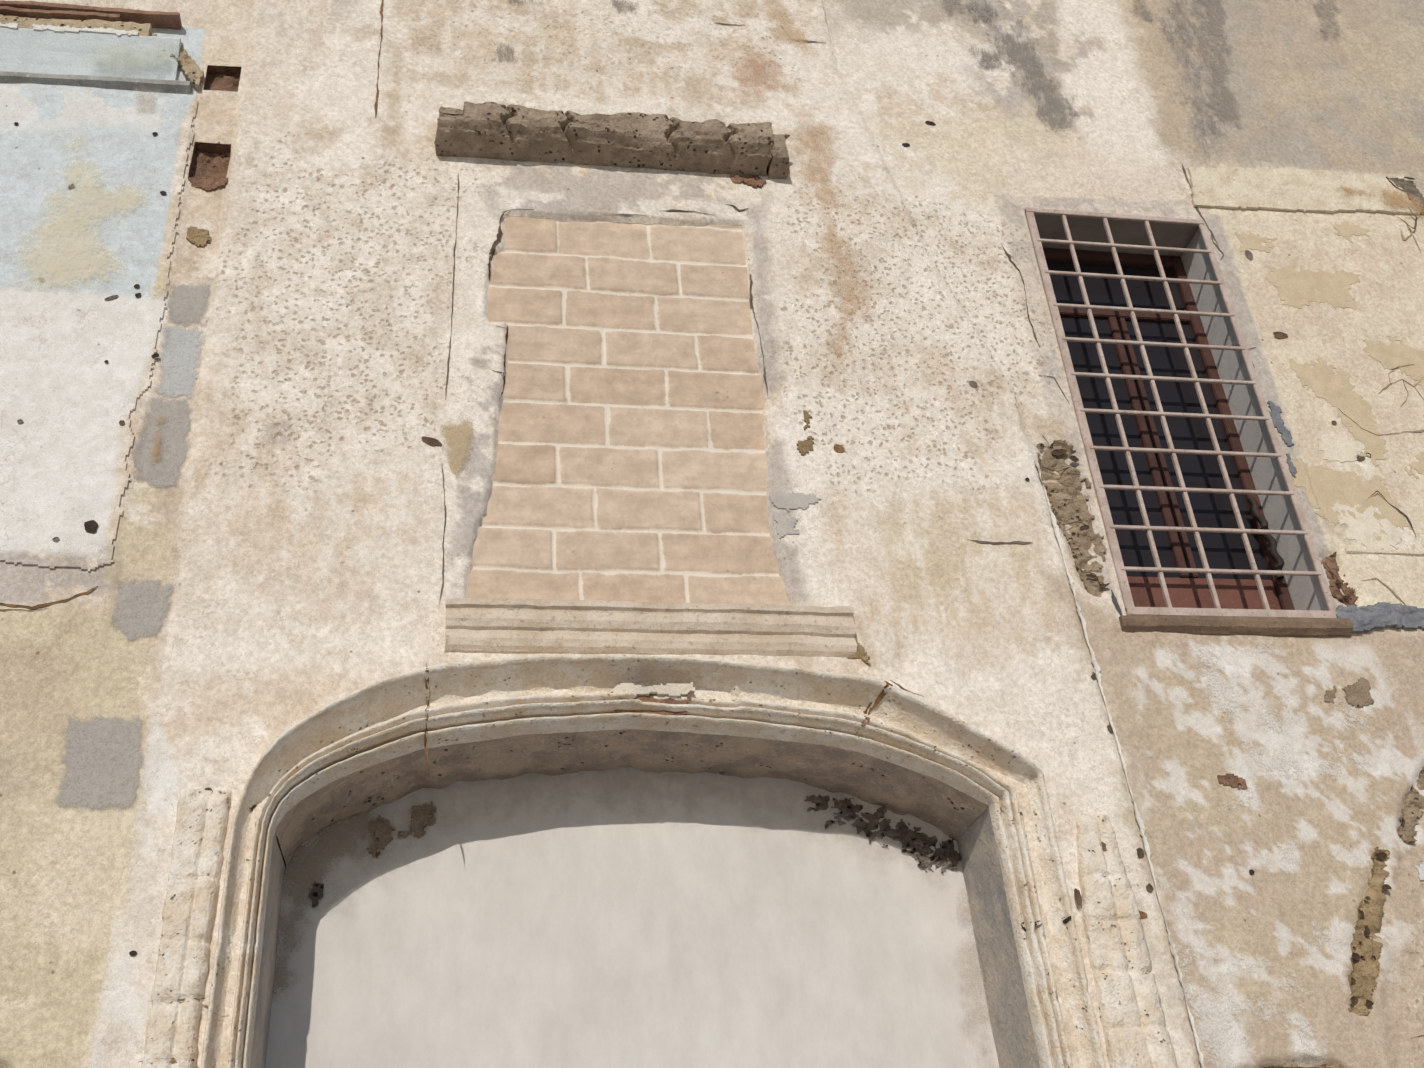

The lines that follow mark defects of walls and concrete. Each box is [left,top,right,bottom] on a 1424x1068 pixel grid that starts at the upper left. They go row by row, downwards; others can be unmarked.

water stain [972,48,1001,69]
crack [1338,364,1424,435]
flaking render [1284,356,1413,541]
spalling [1037,439,1110,597]
crack [1368,491,1416,536]
spalling [1320,552,1359,606]
crack [1361,578,1406,605]
crack [423,663,431,763]
crack [855,678,924,736]
spalling [367,801,436,859]
spalling [804,794,962,873]
spalling [1348,766,1424,1016]